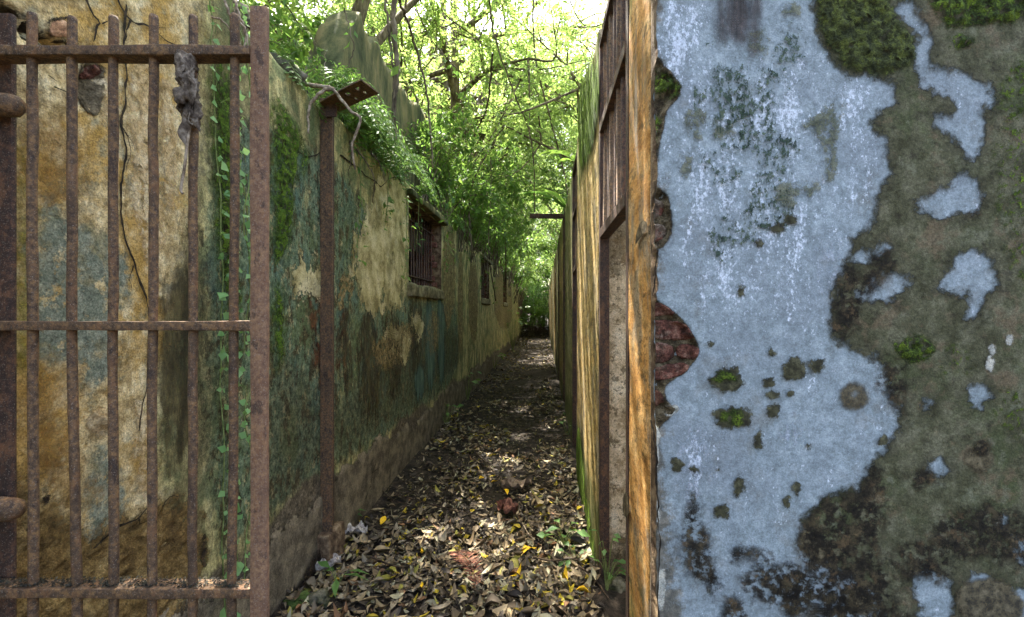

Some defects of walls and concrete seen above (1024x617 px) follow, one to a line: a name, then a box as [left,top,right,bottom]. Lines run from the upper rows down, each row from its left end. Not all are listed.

flaking render [78,63,108,116]
crack [85,0,174,307]
flaking render [129,64,178,258]
flaking render [635,187,672,249]
crack [139,378,147,431]
leakage [340,297,445,426]
flaking render [654,300,700,467]
peeling [798,0,1024,617]
peeling [657,569,666,610]